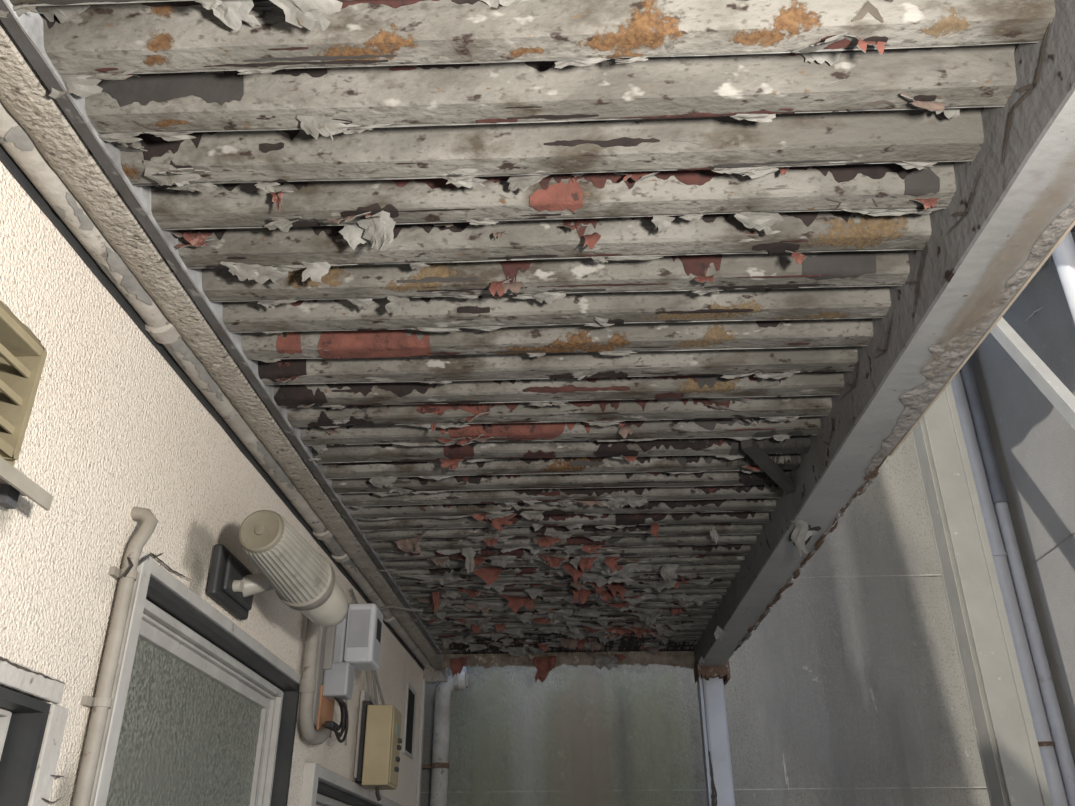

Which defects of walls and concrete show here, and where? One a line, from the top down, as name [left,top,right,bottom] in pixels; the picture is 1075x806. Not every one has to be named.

peeling [41,47,480,107]
peeling [0,0,529,31]
corrosion [318,23,417,61]
corrosion [577,0,684,59]
peeling [525,54,751,72]
corrosion [729,0,822,47]
peeling [788,32,933,65]
peeling [544,137,660,148]
peeling [98,132,508,251]
corrosion [497,328,630,354]
corrosion [734,446,896,651]
crack [42,775,65,803]